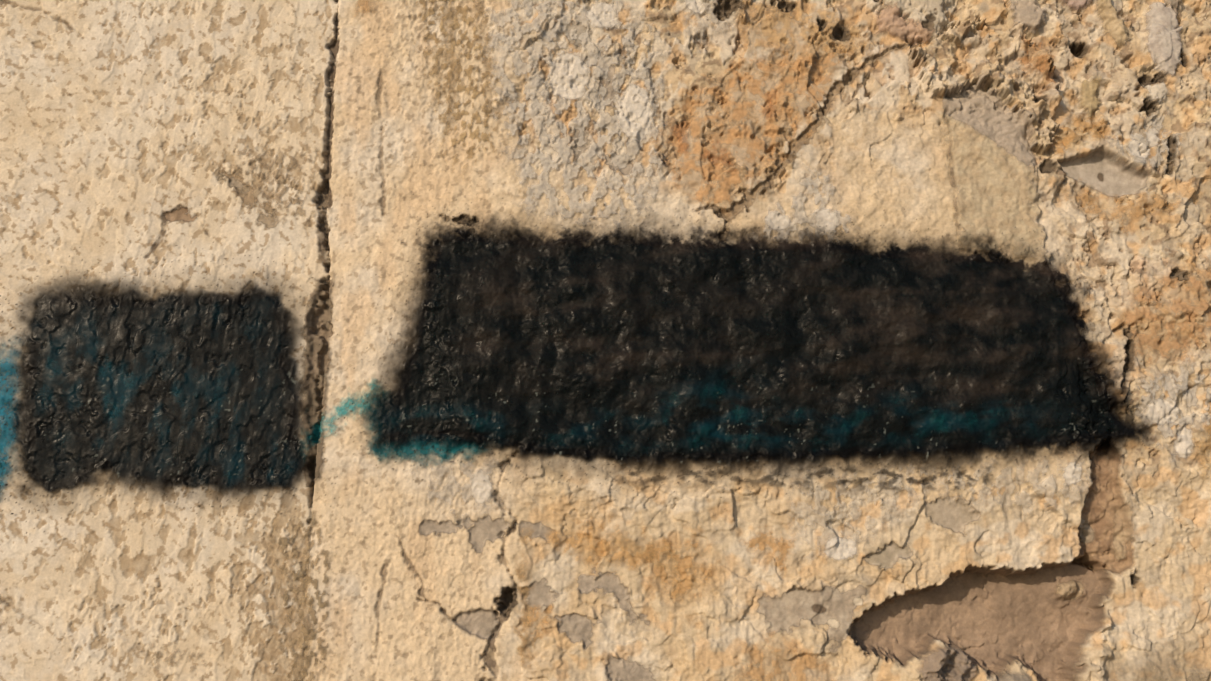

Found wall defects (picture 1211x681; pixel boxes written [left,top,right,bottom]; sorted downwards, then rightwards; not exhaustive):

crack [697,40,923,237]
crack [300,0,339,496]
crack [374,542,446,657]
crack [482,611,510,681]
crack [496,460,516,561]
spalling [757,449,1134,681]